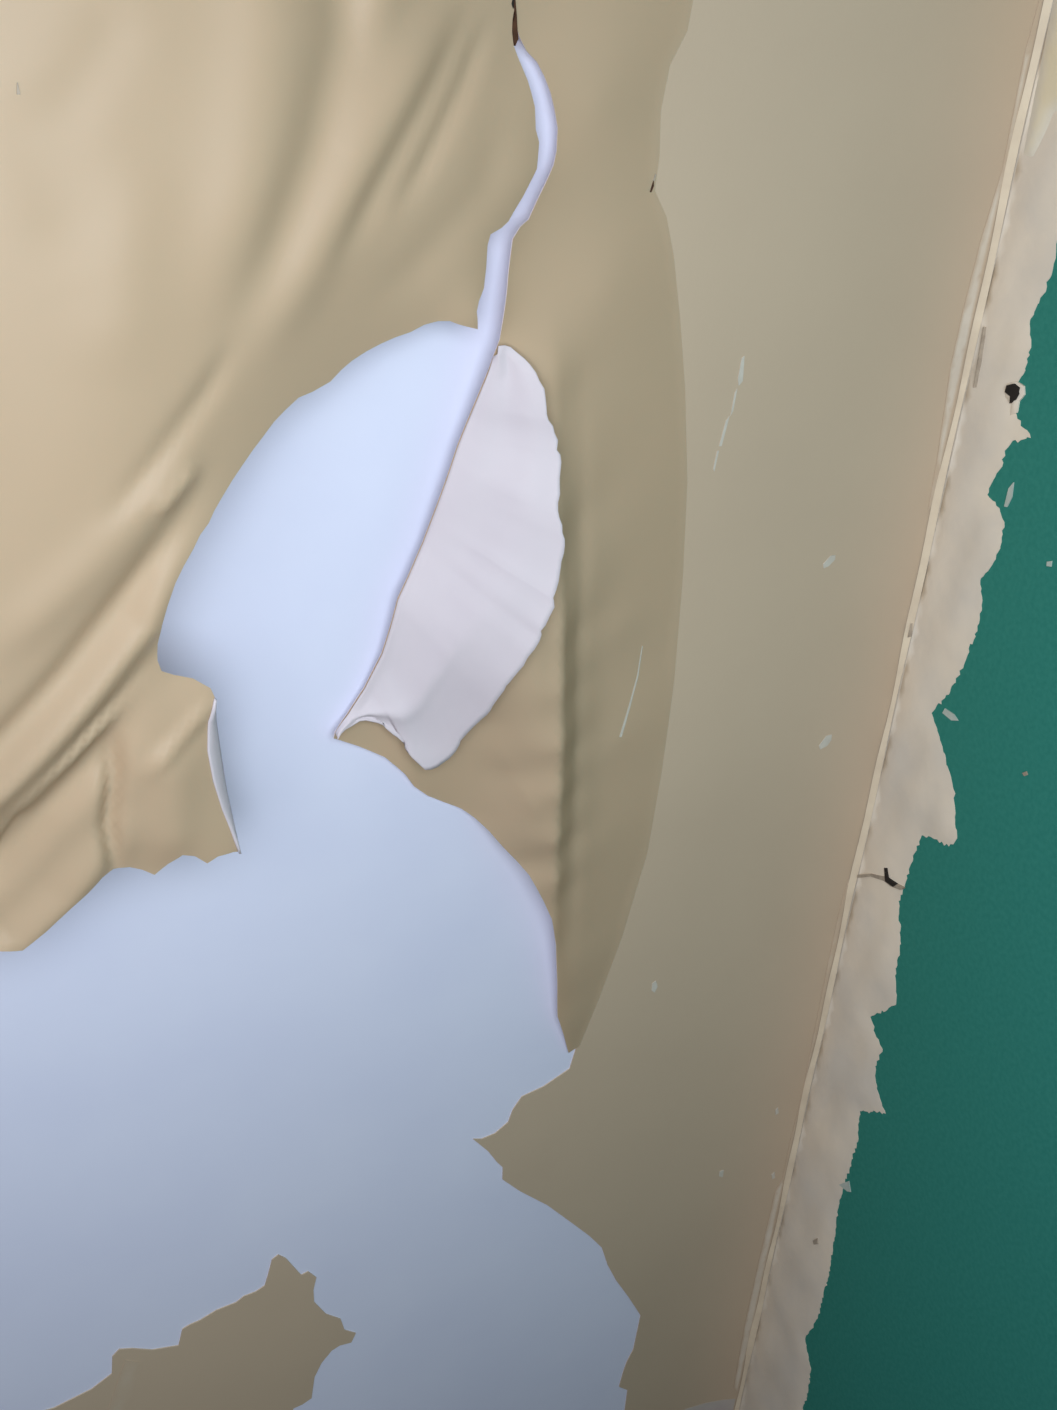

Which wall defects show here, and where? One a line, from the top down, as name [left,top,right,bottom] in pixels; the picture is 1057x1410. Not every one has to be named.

flaking render [0,0,640,1410]